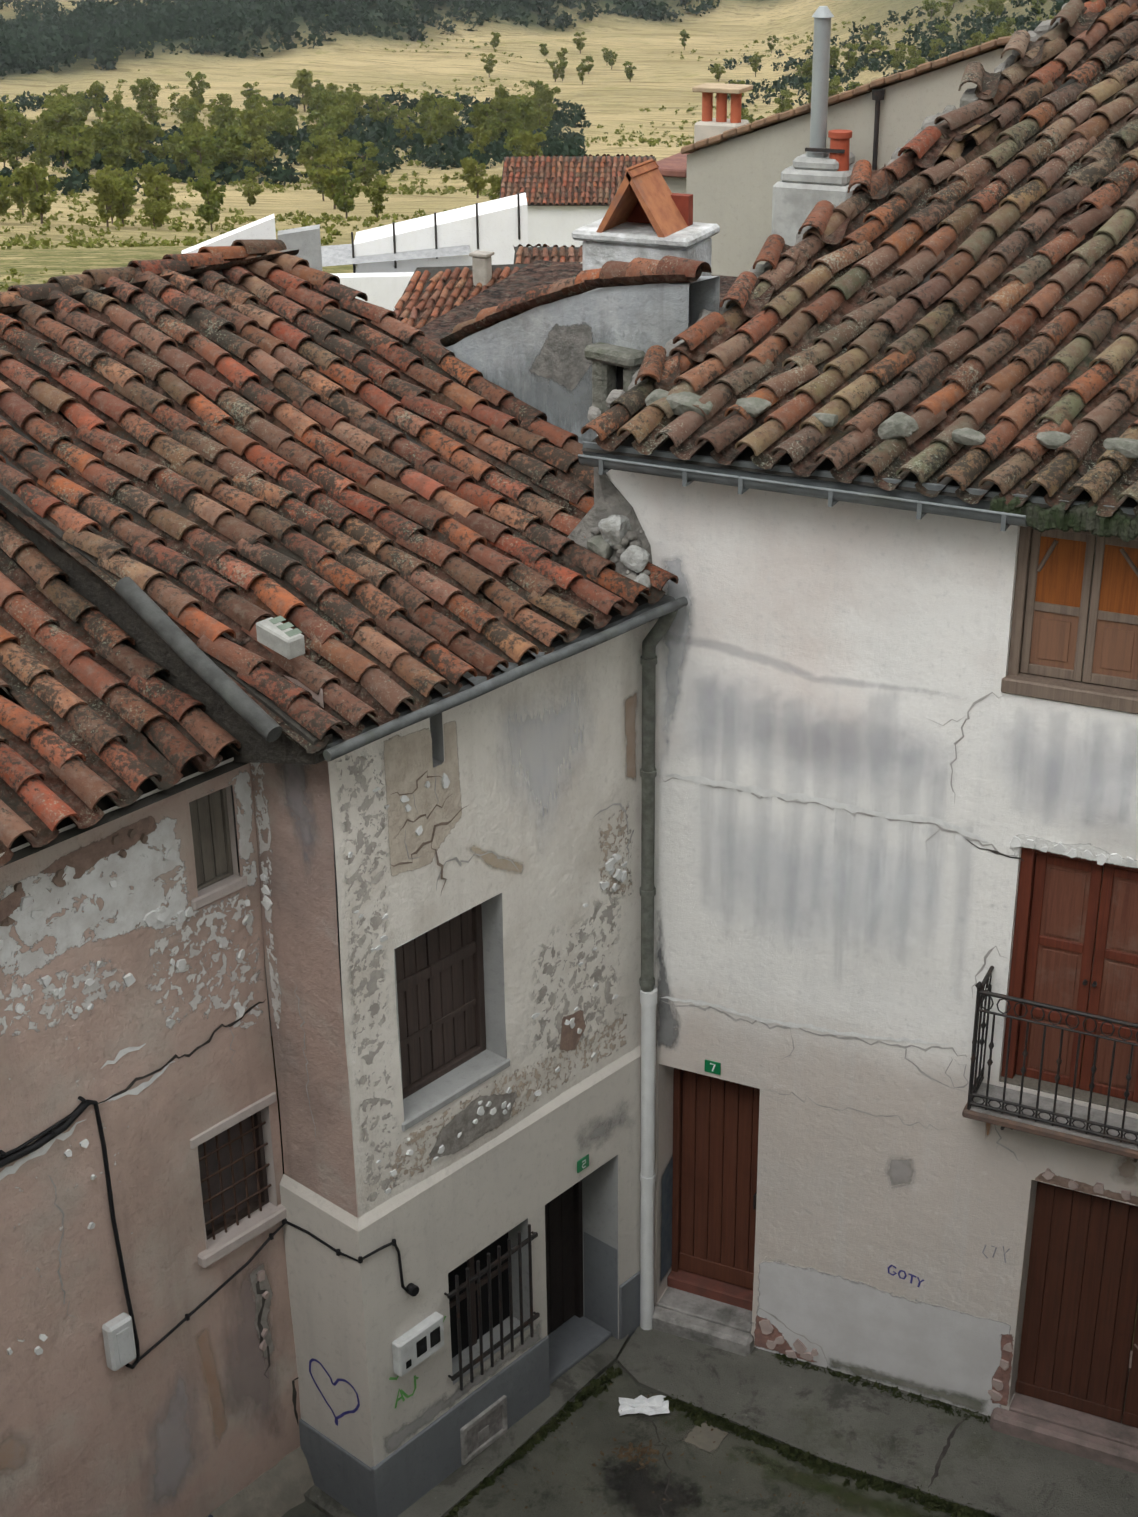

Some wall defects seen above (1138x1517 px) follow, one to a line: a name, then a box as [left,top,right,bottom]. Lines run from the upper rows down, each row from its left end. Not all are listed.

crack [663,692,1024,861]
crack [390,806,519,893]
peeling [0,763,282,1050]
flaking render [340,721,634,1201]
crack [972,946,1006,996]
crack [98,999,266,1104]
crack [661,996,970,1133]
peeling [64,1139,89,1157]
peeling [7,1324,53,1355]
flaking render [754,1308,828,1365]